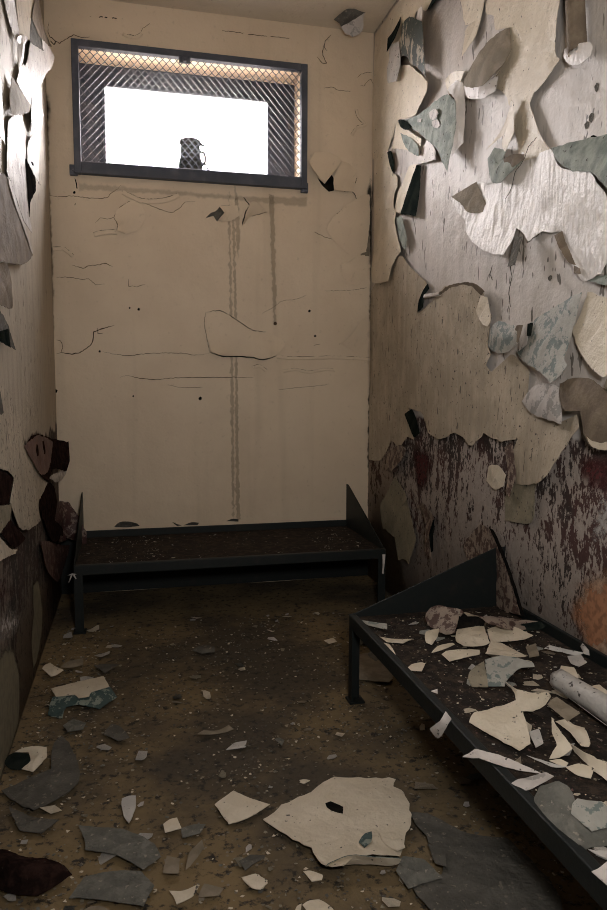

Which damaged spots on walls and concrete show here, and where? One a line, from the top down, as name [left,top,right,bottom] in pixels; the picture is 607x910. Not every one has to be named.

peeling [0,0,55,350]
crack [50,179,195,213]
peeling [309,0,607,564]
crack [57,325,370,390]
peeling [0,385,90,582]
leakage [414,451,430,488]
leakage [594,502,607,541]
flaking render [0,650,20,781]
peeling [31,580,117,732]